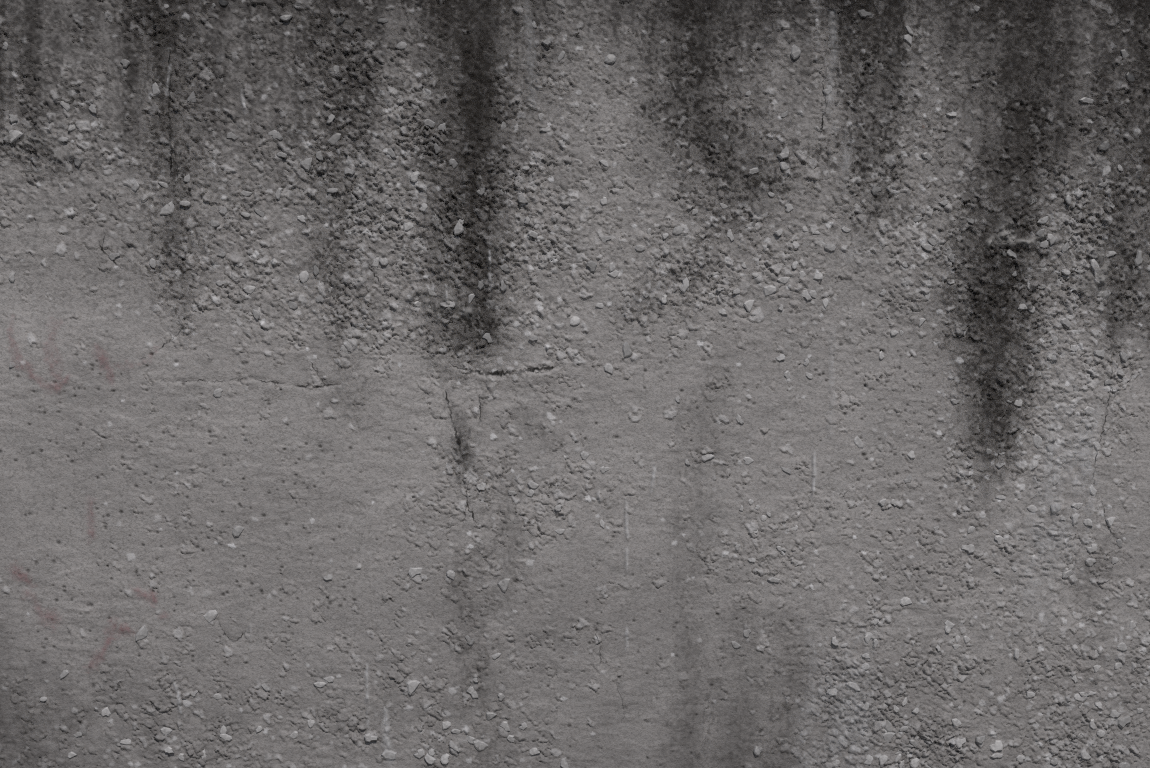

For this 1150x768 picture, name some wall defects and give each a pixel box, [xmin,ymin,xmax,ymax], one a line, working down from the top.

water stain [0,0,547,139]
water stain [608,0,1150,155]
crack [446,366,553,444]